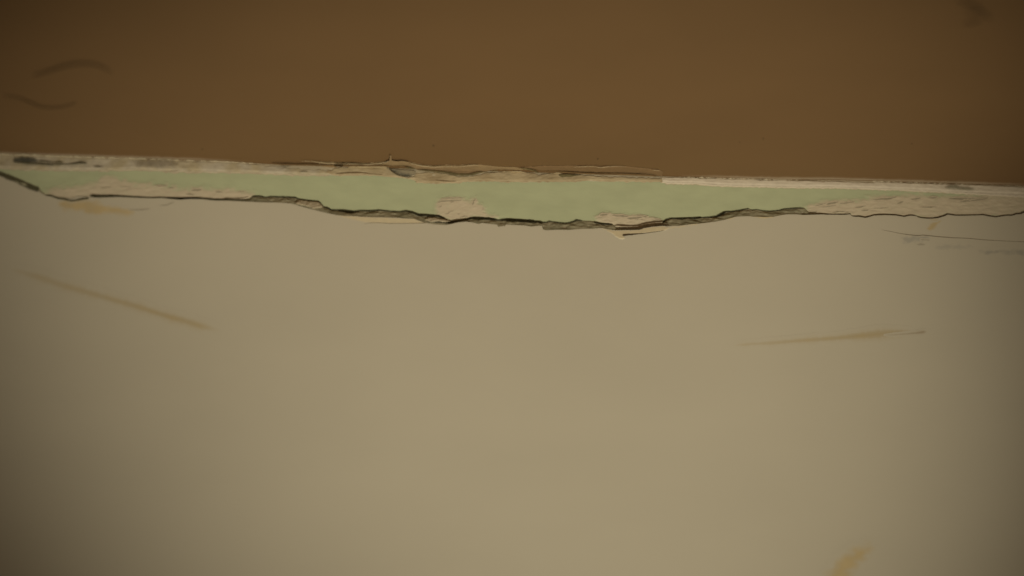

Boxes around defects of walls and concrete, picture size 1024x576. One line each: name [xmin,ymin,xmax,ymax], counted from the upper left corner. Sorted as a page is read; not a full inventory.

spalling [0,156,1024,240]